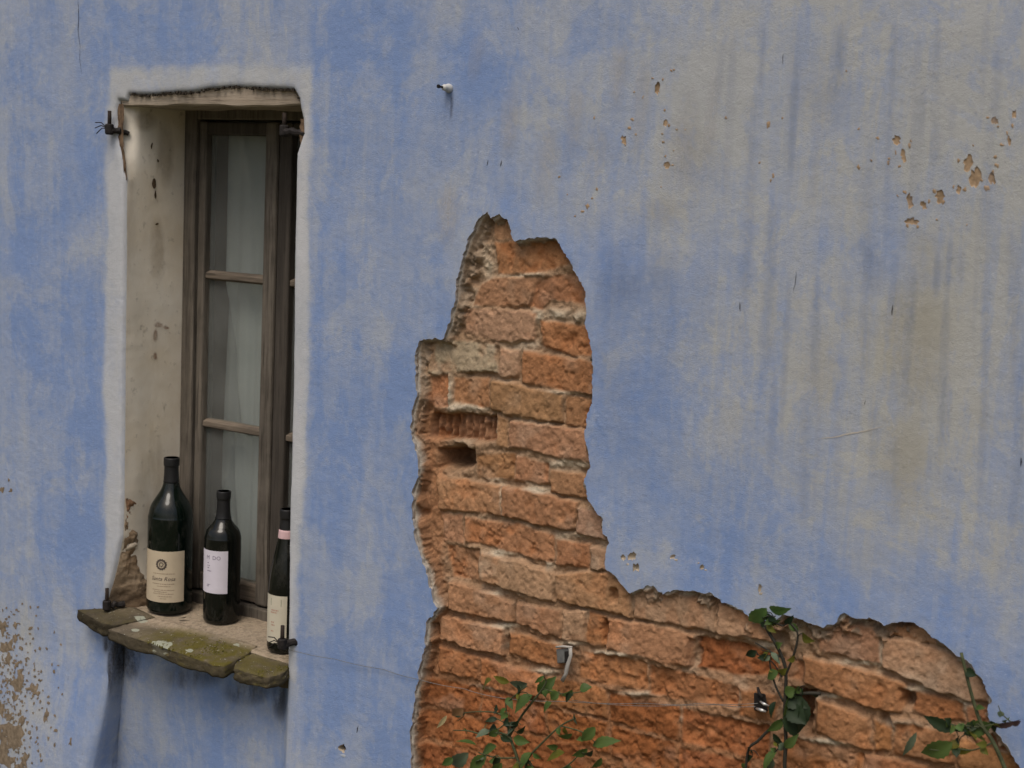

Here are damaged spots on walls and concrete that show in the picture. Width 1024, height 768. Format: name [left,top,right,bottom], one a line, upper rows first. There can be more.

peeling [875,135,912,168]
peeling [897,110,1016,228]
flaking render [410,212,1020,768]
peeling [0,603,72,768]